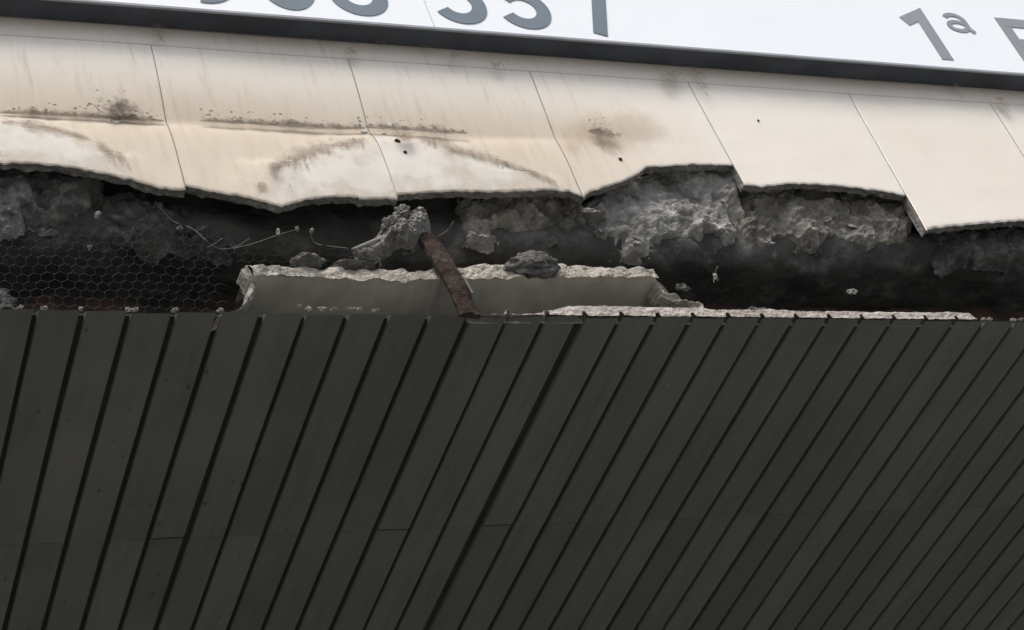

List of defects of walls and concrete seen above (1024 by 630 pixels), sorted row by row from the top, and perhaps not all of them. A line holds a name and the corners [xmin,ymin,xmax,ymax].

water stain [0,90,163,129]
water stain [199,109,484,158]
water stain [588,119,620,138]
spalling [0,168,237,268]
spalling [453,170,912,266]
spalling [925,226,1024,279]
spalling [0,288,18,309]